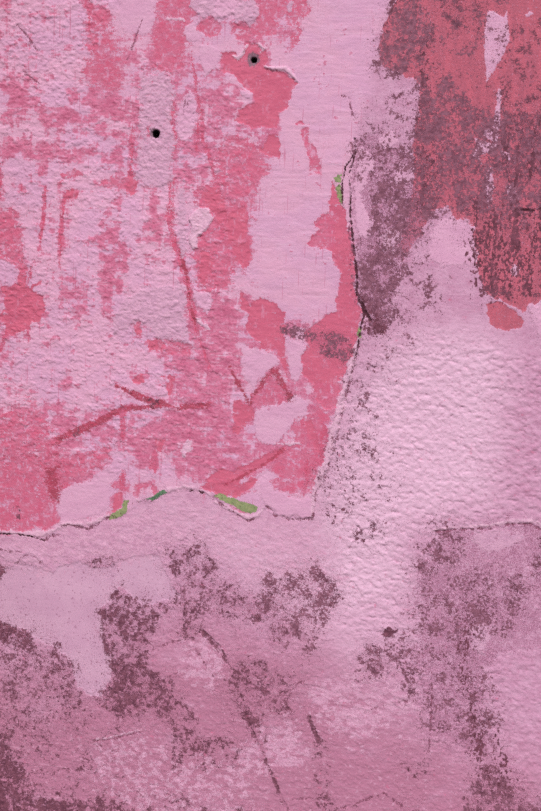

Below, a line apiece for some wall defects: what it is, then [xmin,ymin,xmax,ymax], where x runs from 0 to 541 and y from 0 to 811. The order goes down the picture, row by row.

peeling [377,0,541,335]
crack [0,517,110,542]
leakage [0,530,354,811]
flaking render [0,0,363,701]
leakage [271,0,541,811]